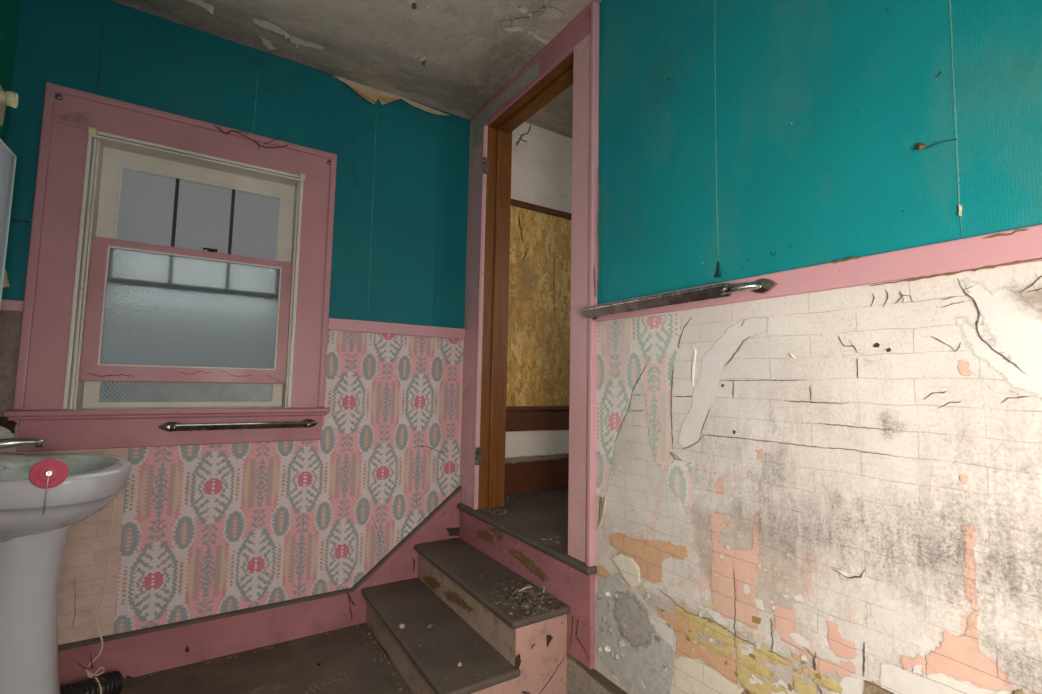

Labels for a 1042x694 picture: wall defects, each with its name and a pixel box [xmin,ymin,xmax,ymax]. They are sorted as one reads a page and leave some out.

peeling [251,18,325,50]
peeling [331,75,448,115]
crack [871,289,913,307]
crack [931,279,1028,403]
peeling [957,359,971,376]
peeling [596,496,606,531]
peeling [595,512,1039,694]
peeling [566,658,611,694]